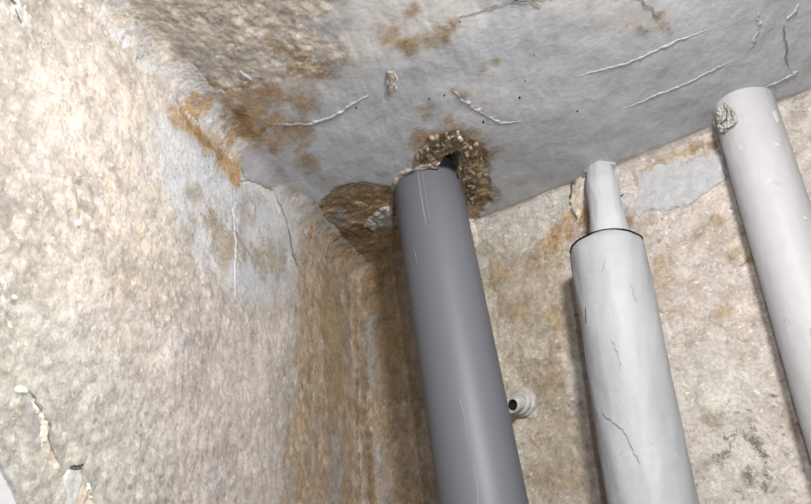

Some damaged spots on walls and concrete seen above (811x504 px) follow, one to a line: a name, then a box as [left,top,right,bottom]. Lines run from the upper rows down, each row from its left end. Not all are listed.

crack [460,0,541,17]
crack [764,4,800,88]
crack [232,179,297,298]
peeling [309,130,482,276]
damp [272,223,430,504]
peeling [14,385,94,504]